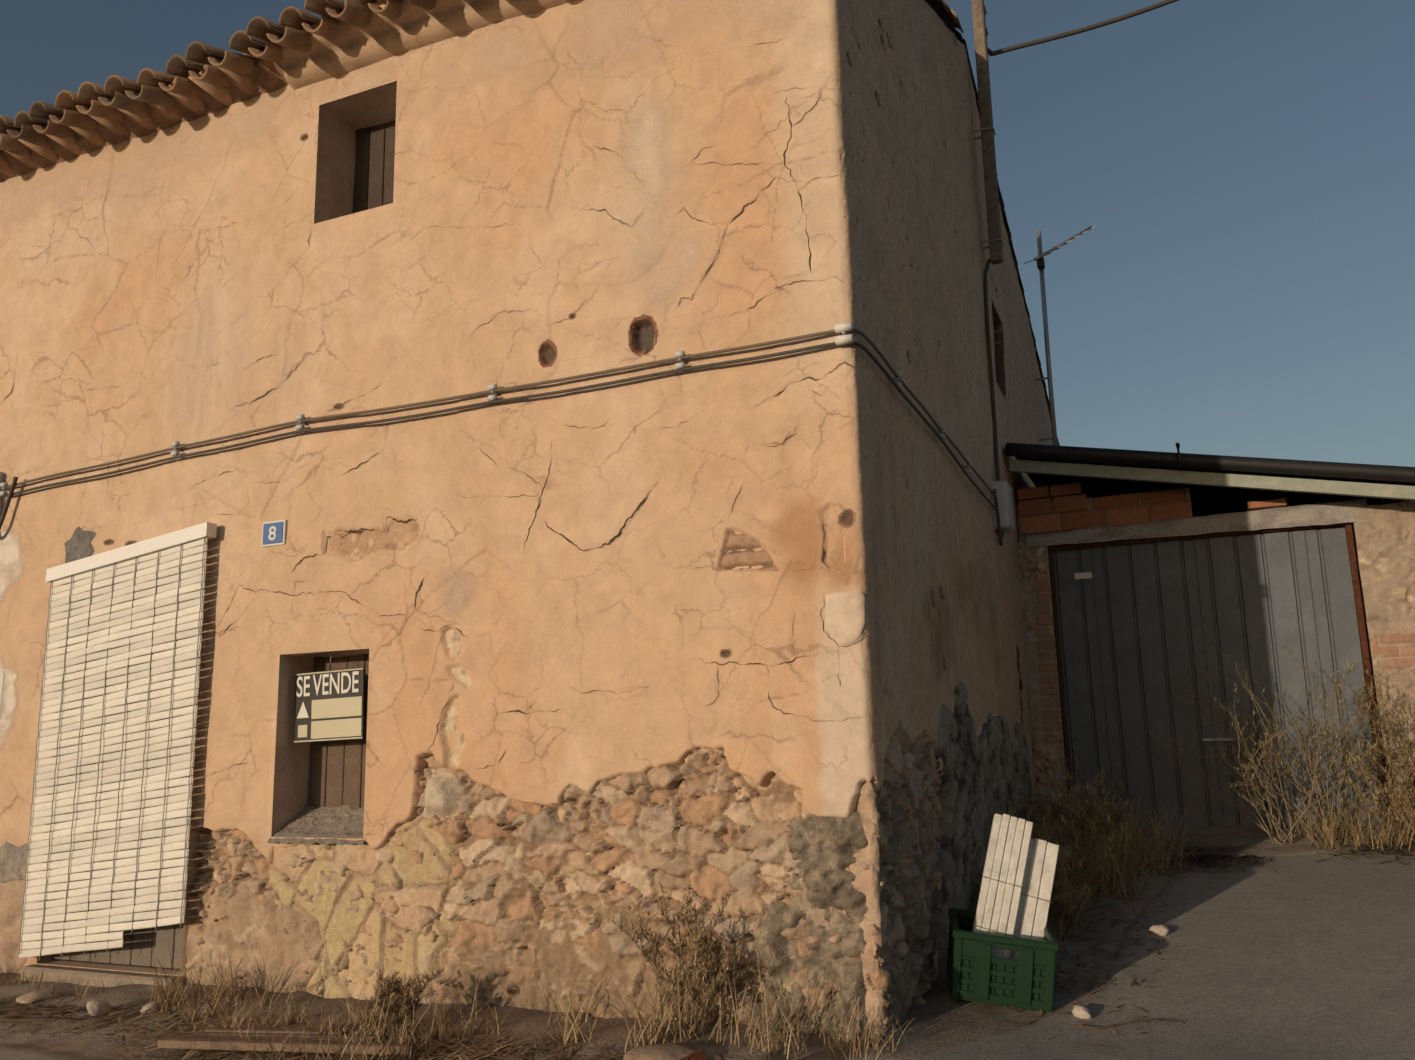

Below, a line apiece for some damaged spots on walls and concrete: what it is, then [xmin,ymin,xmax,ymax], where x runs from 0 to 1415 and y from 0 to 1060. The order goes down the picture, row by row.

crack [576,87,843,319]
crack [186,354,299,407]
crack [750,362,854,407]
crack [202,516,468,638]
spalling [327,519,421,560]
crack [458,417,659,553]
spalling [721,531,779,571]
crack [699,526,865,721]
crack [501,681,649,714]
spalling [185,630,891,1026]